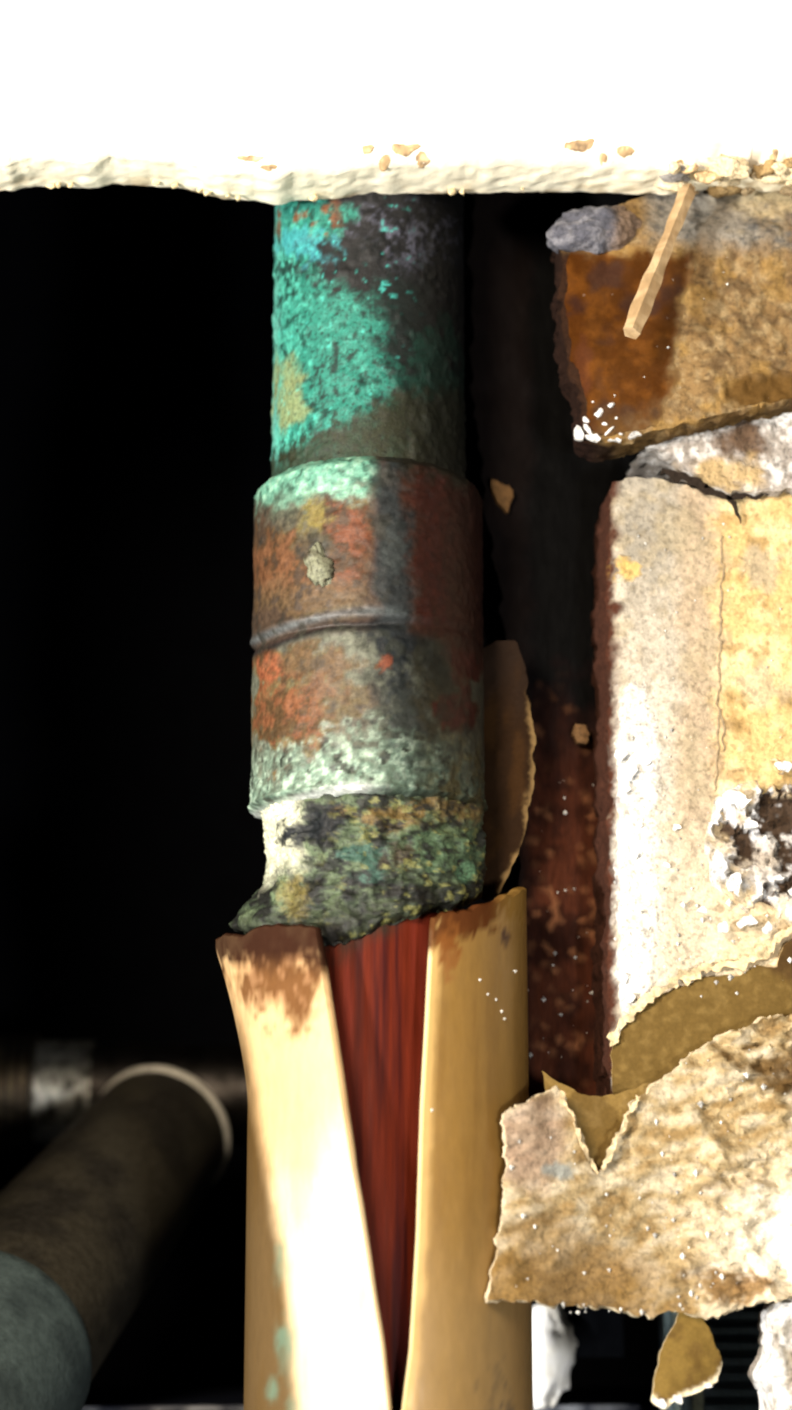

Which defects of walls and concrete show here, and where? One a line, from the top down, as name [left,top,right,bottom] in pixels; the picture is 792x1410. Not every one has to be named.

crack [660,468,769,792]
peeling [542,758,792,1172]
flaking render [748,1298,792,1410]